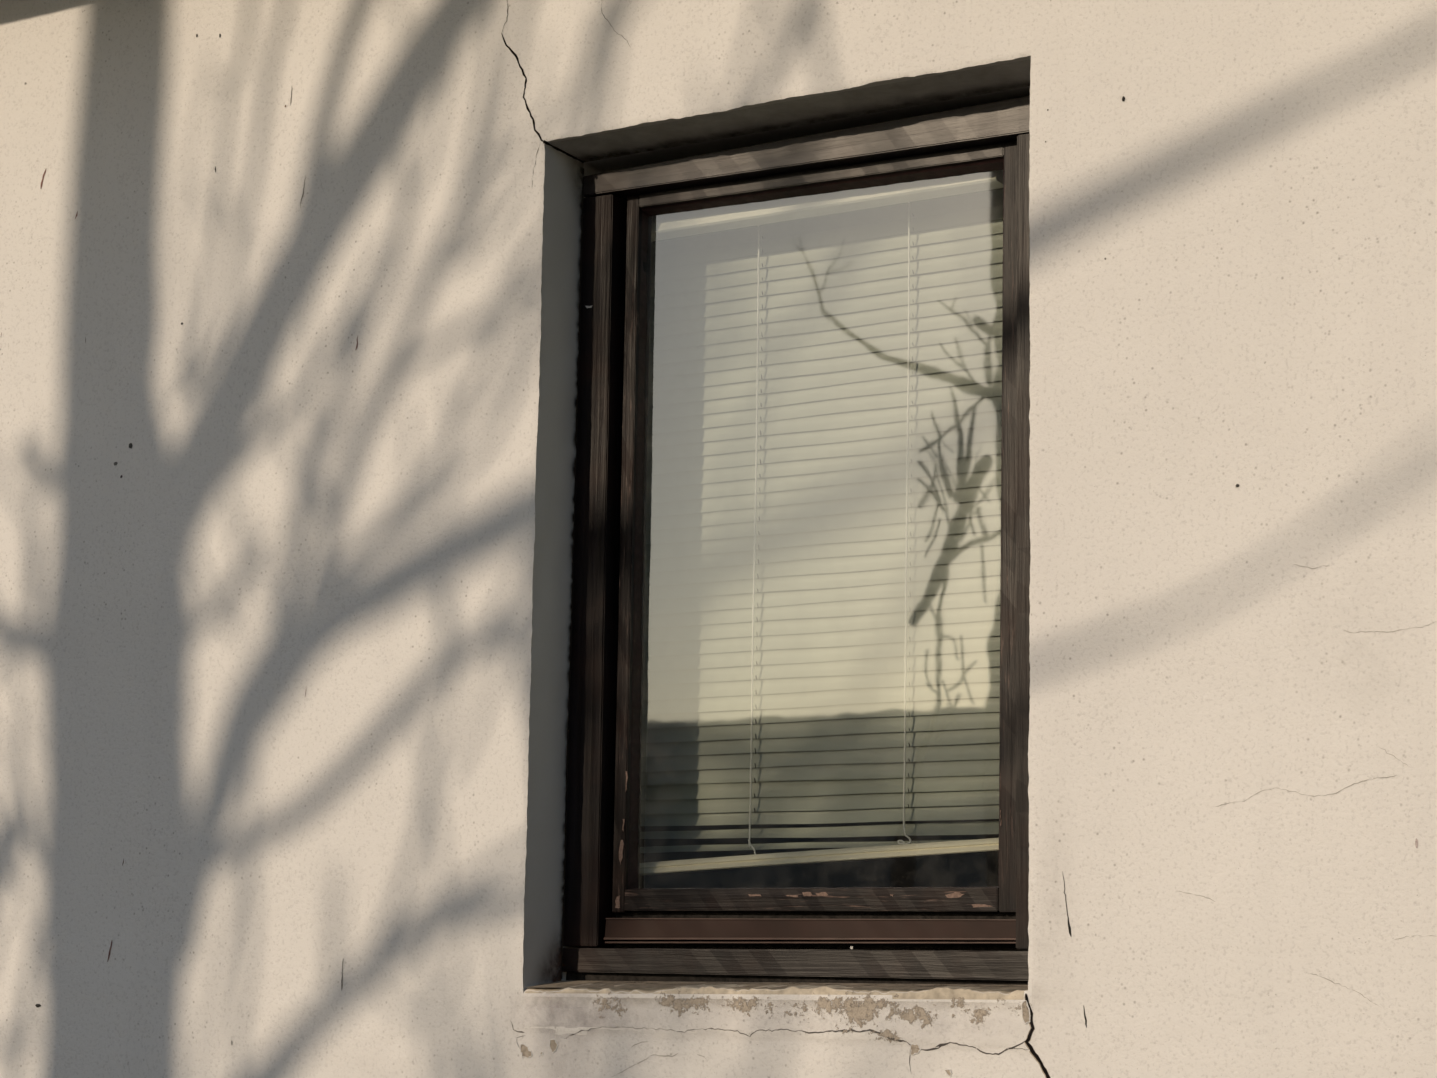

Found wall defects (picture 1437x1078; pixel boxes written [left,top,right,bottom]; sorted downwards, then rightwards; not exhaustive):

crack [501,3,584,183]
peeling [593,992,628,1019]
crack [564,994,1050,1078]
peeling [655,990,1032,1056]